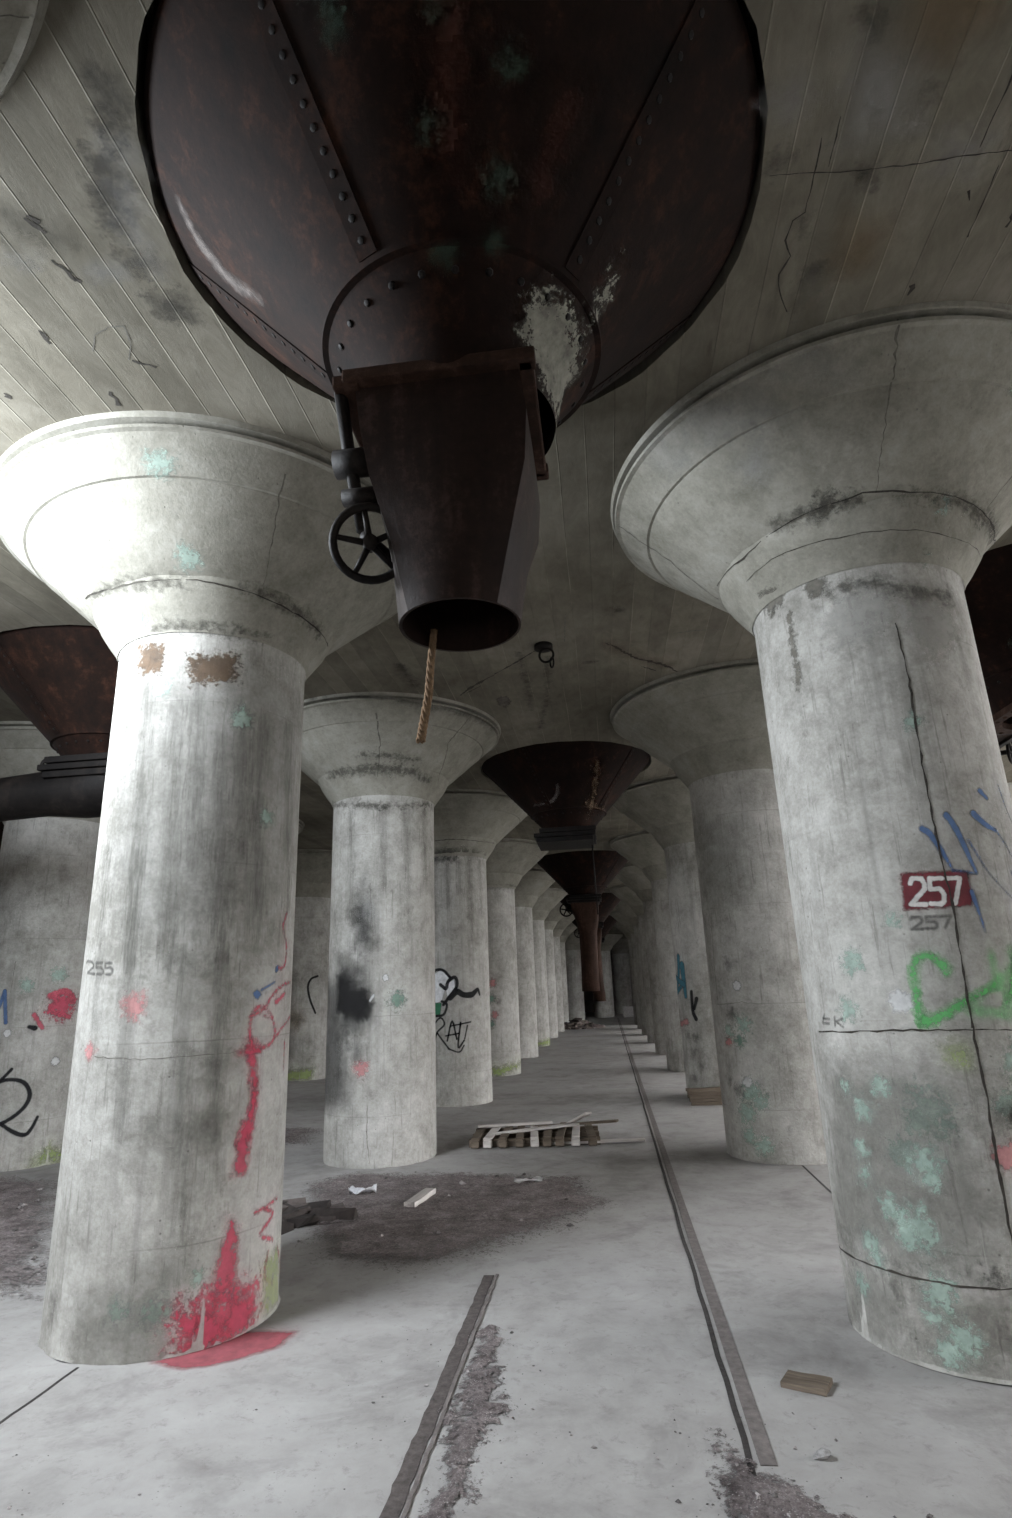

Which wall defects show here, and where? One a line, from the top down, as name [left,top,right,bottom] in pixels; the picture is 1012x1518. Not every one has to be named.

corrosion [137,638,165,676]
corrosion [185,651,241,687]
crack [819,623,1012,1241]
crack [839,1246,1012,1290]